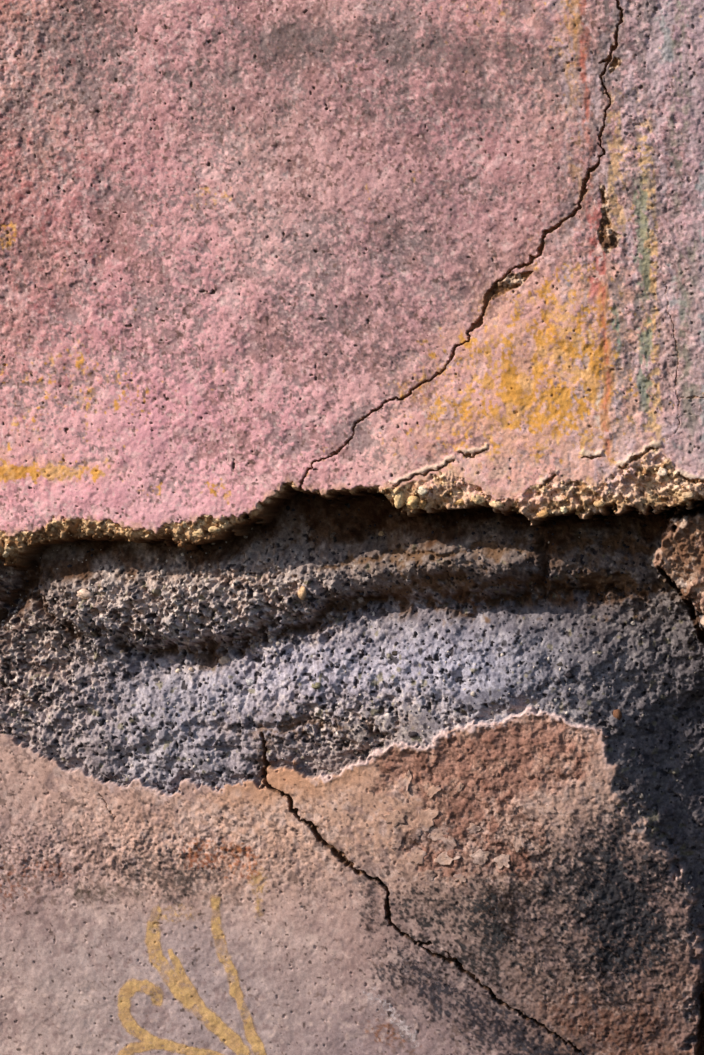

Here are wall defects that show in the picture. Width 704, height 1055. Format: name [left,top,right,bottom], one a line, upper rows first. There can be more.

crack [299,0,624,487]
spalling [0,447,704,1014]
crack [259,731,584,1055]